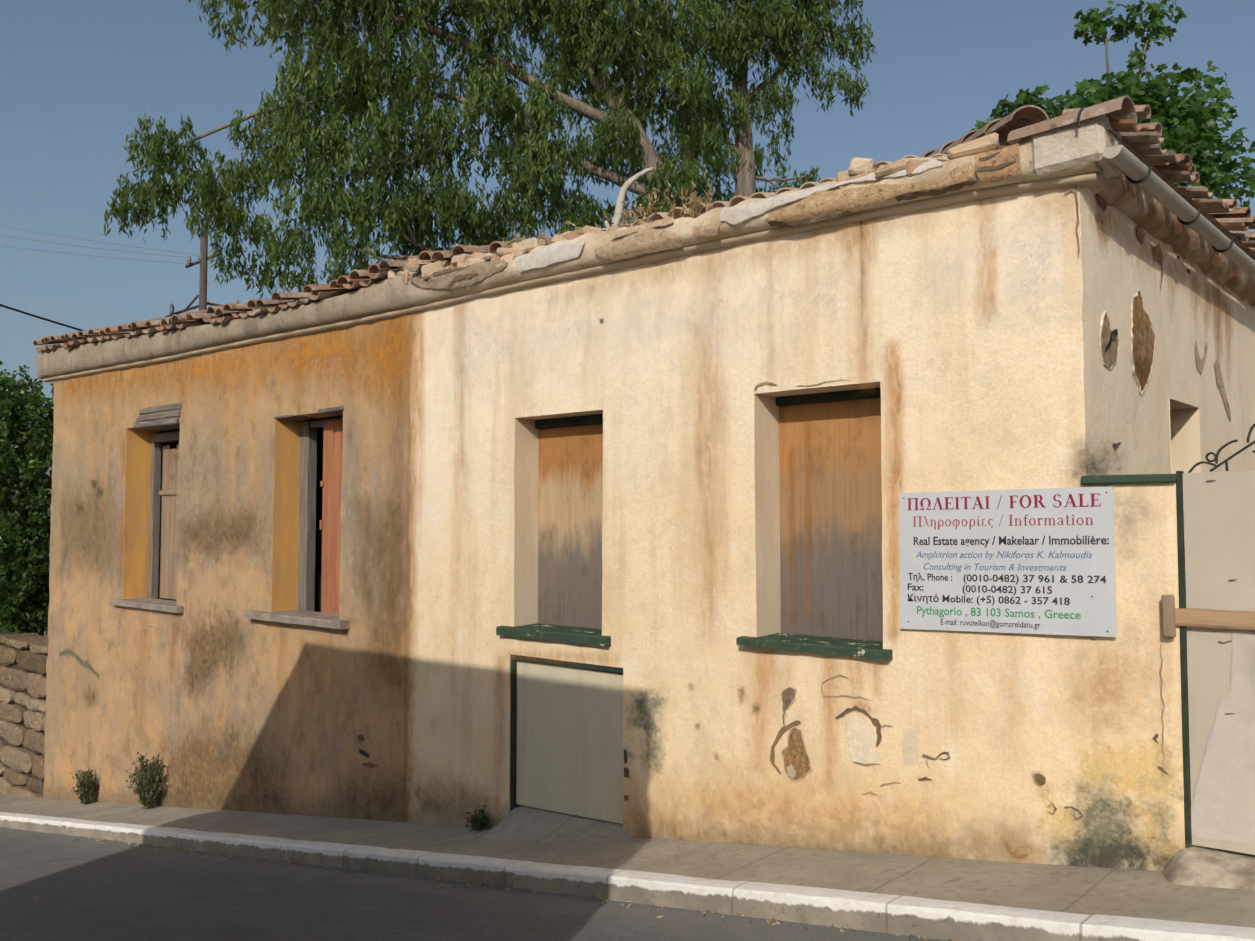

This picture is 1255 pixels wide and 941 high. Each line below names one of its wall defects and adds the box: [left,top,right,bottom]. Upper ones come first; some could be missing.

flaking render [1137,225,1163,290]
flaking render [1099,290,1156,396]
peeling [1195,342,1231,420]
flaking render [770,685,813,783]
peeling [835,706,919,766]